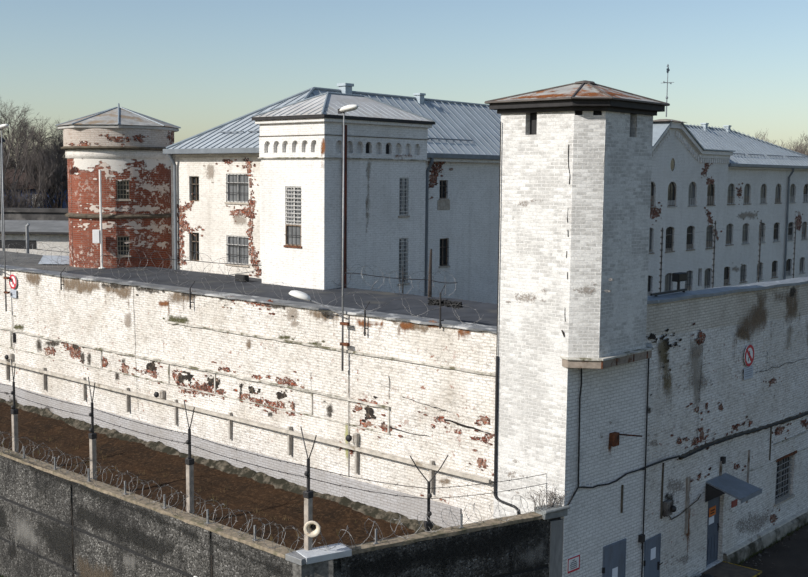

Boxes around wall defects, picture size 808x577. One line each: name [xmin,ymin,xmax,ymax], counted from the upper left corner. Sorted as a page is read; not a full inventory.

peeling [71,158,204,268]
spalling [204,157,262,277]
spalling [650,200,662,225]
leakage [736,295,767,344]
leakage [776,287,798,343]
spalling [37,337,88,370]
spalling [100,357,162,384]
spalling [172,361,304,416]
crack [379,376,490,434]
spalling [417,411,494,476]
leakage [658,341,672,393]
spalling [671,402,724,450]